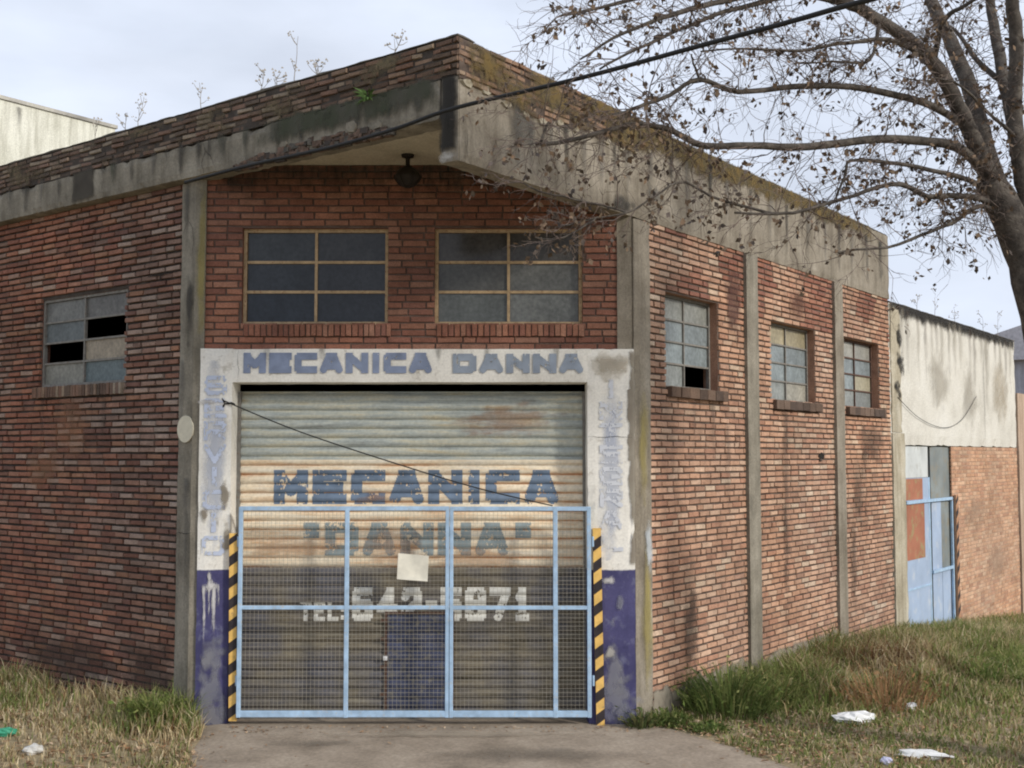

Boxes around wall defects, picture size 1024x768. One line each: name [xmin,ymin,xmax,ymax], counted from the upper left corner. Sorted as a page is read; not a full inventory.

water stain [439,76,456,152]
water stain [72,164,115,202]
water stain [891,303,1013,348]
water stain [598,358,626,373]
peeling [221,485,229,509]
peeling [604,648,639,722]